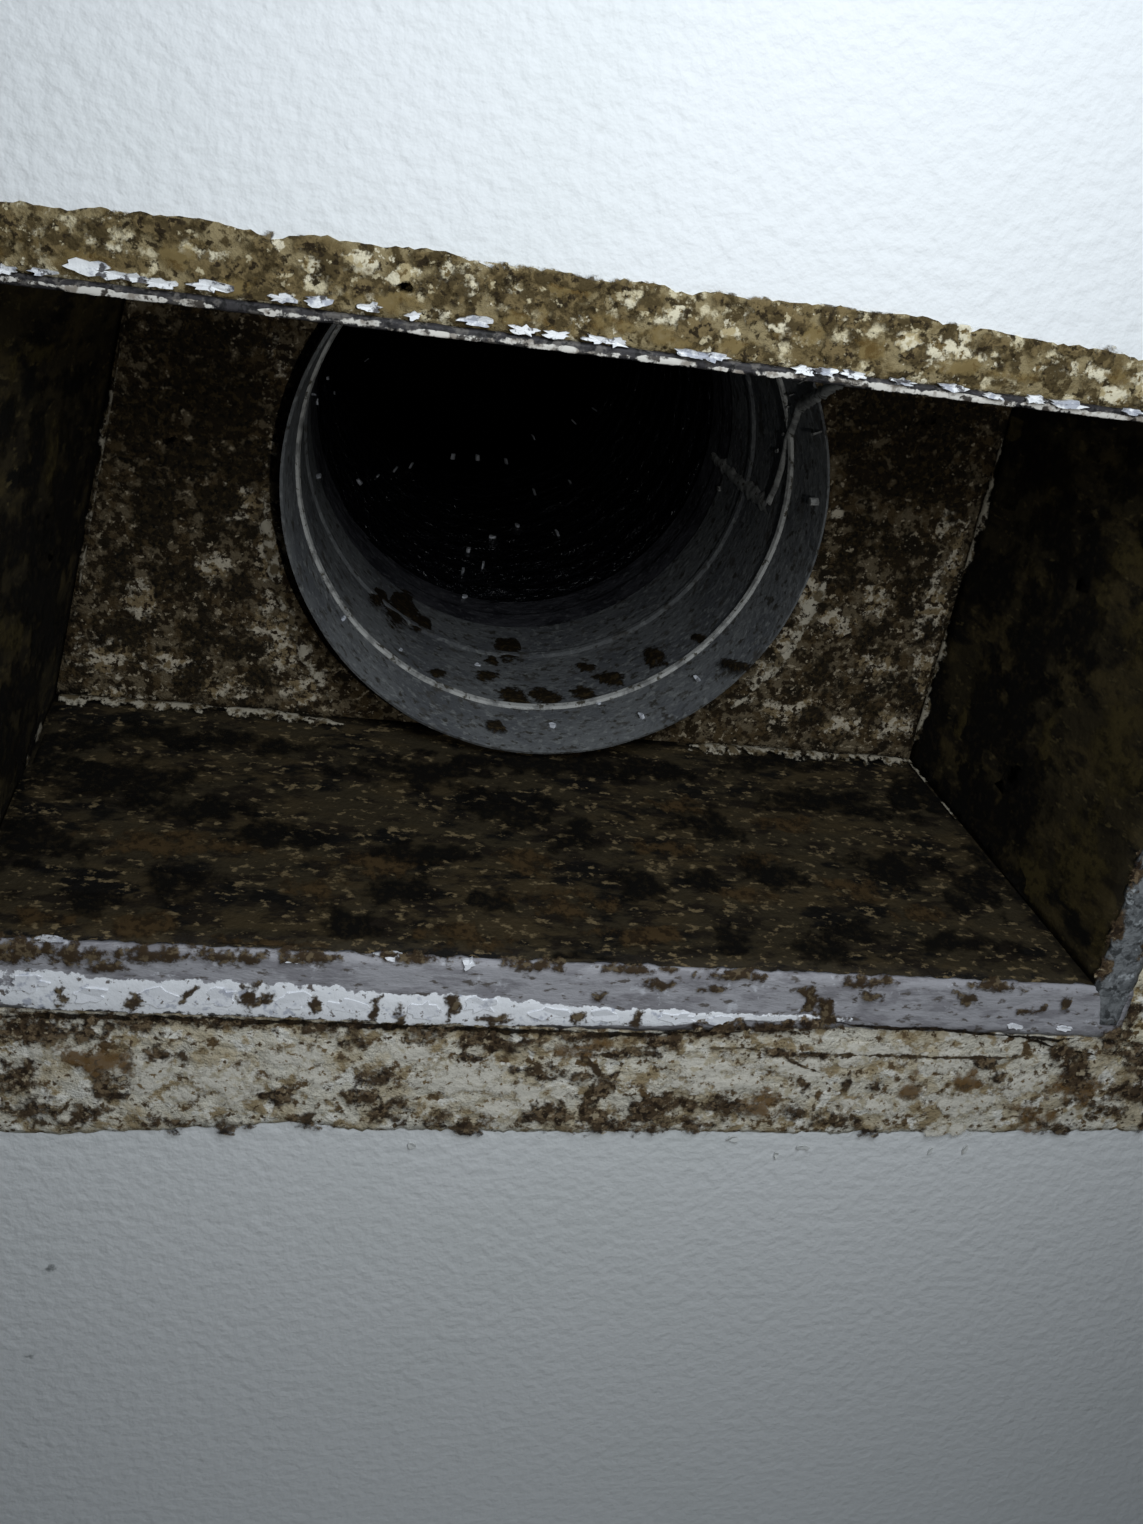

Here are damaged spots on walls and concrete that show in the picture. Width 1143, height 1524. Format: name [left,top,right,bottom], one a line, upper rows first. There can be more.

water stain [0,202,1143,981]
water stain [141,1113,188,1136]
water stain [206,1114,256,1136]
water stain [0,839,481,1130]
water stain [301,921,900,1138]
water stain [965,1055,1013,1083]
water stain [951,976,1072,1015]
water stain [1036,989,1143,1135]